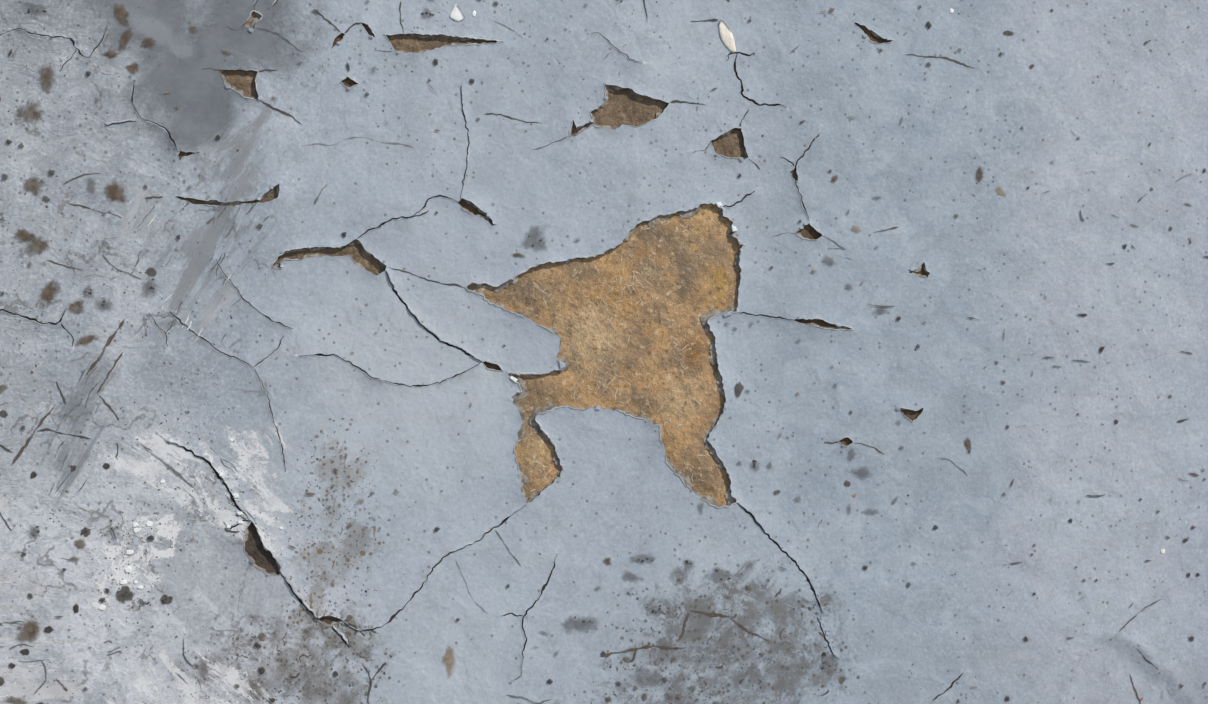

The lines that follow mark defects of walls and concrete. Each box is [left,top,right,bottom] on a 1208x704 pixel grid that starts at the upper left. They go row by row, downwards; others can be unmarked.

peeling [362,0,505,65]
leakage [105,0,281,344]
peeling [568,83,669,137]
peeling [711,128,748,178]
crack [726,52,787,126]
peeling [271,232,386,276]
crack [149,259,480,472]
peeling [459,190,753,509]
crack [168,441,250,533]
spalling [243,520,281,576]
crack [280,506,558,681]
crack [737,503,834,656]